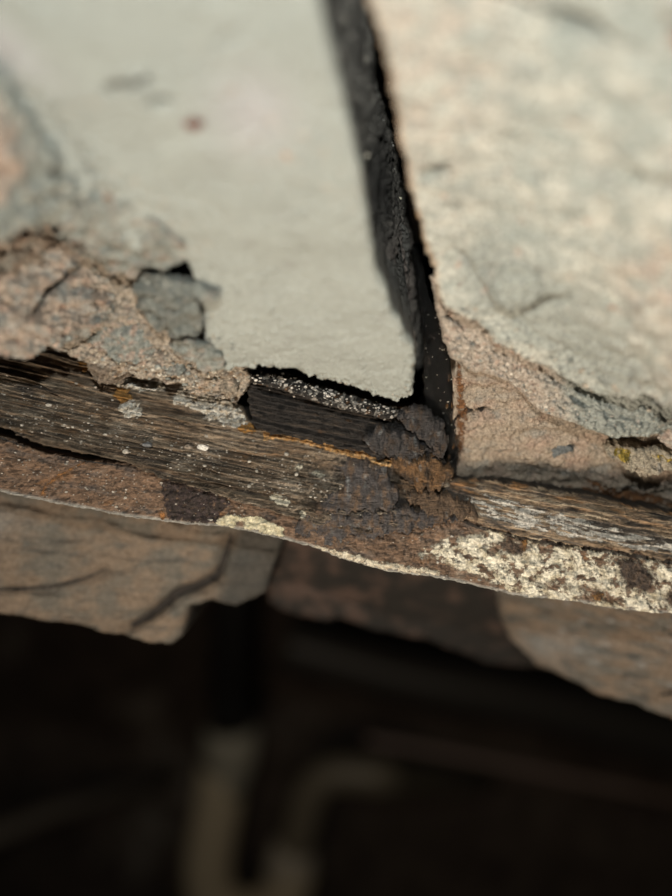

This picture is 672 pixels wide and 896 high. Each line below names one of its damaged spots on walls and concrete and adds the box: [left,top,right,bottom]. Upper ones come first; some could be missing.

spalling [0,196,254,403]
rust [455,363,467,452]
spalling [429,274,672,477]
leakage [315,493,672,613]